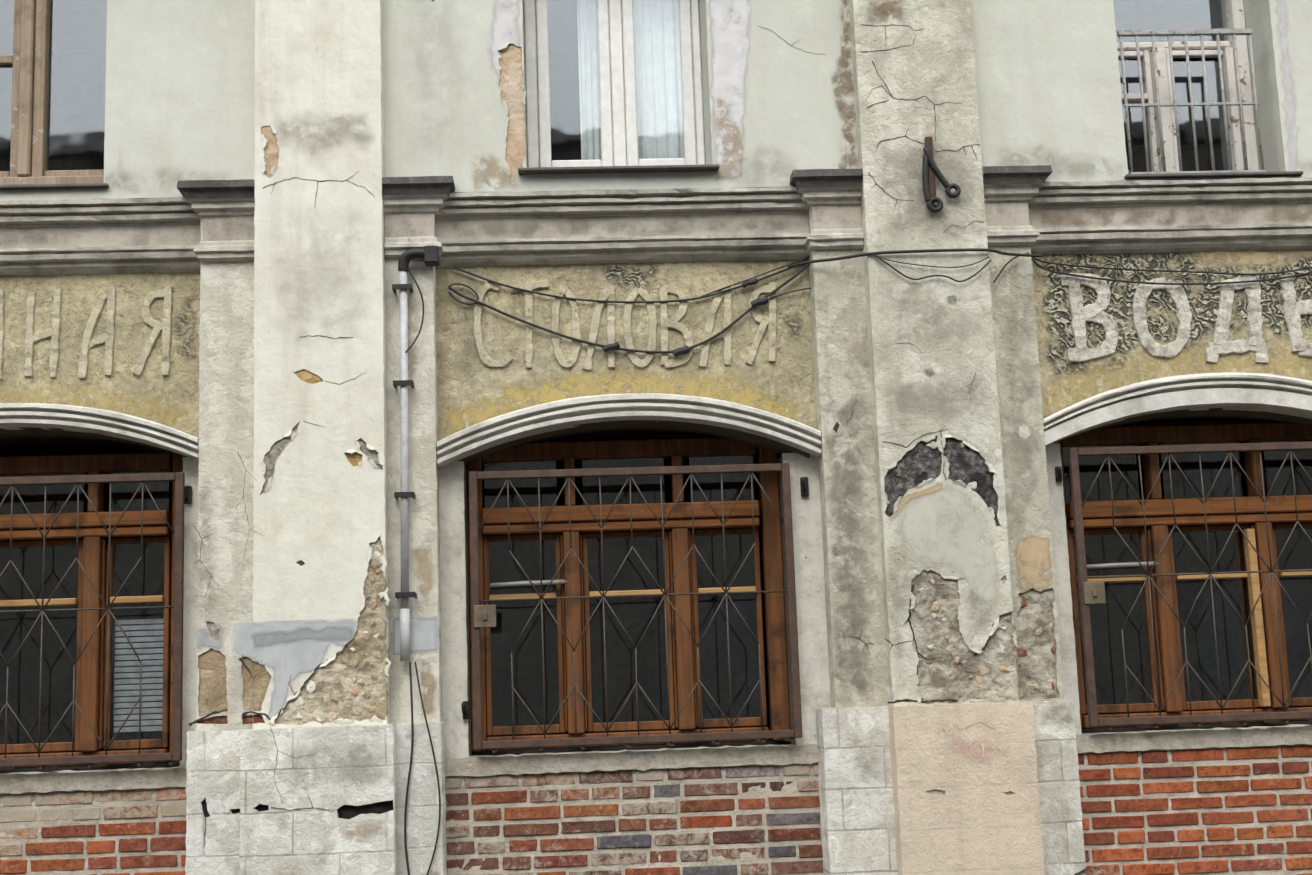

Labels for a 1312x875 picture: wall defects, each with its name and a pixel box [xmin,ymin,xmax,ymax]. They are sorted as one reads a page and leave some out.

peeling [260,124,279,178]
crack [263,171,375,204]
peeling [498,42,527,180]
crack [861,24,980,212]
peeling [294,369,324,384]
peeling [260,420,300,495]
peeling [344,438,384,470]
peeling [883,434,1002,527]
spalling [197,535,391,726]
spalling [909,570,1060,704]
crack [189,643,348,812]